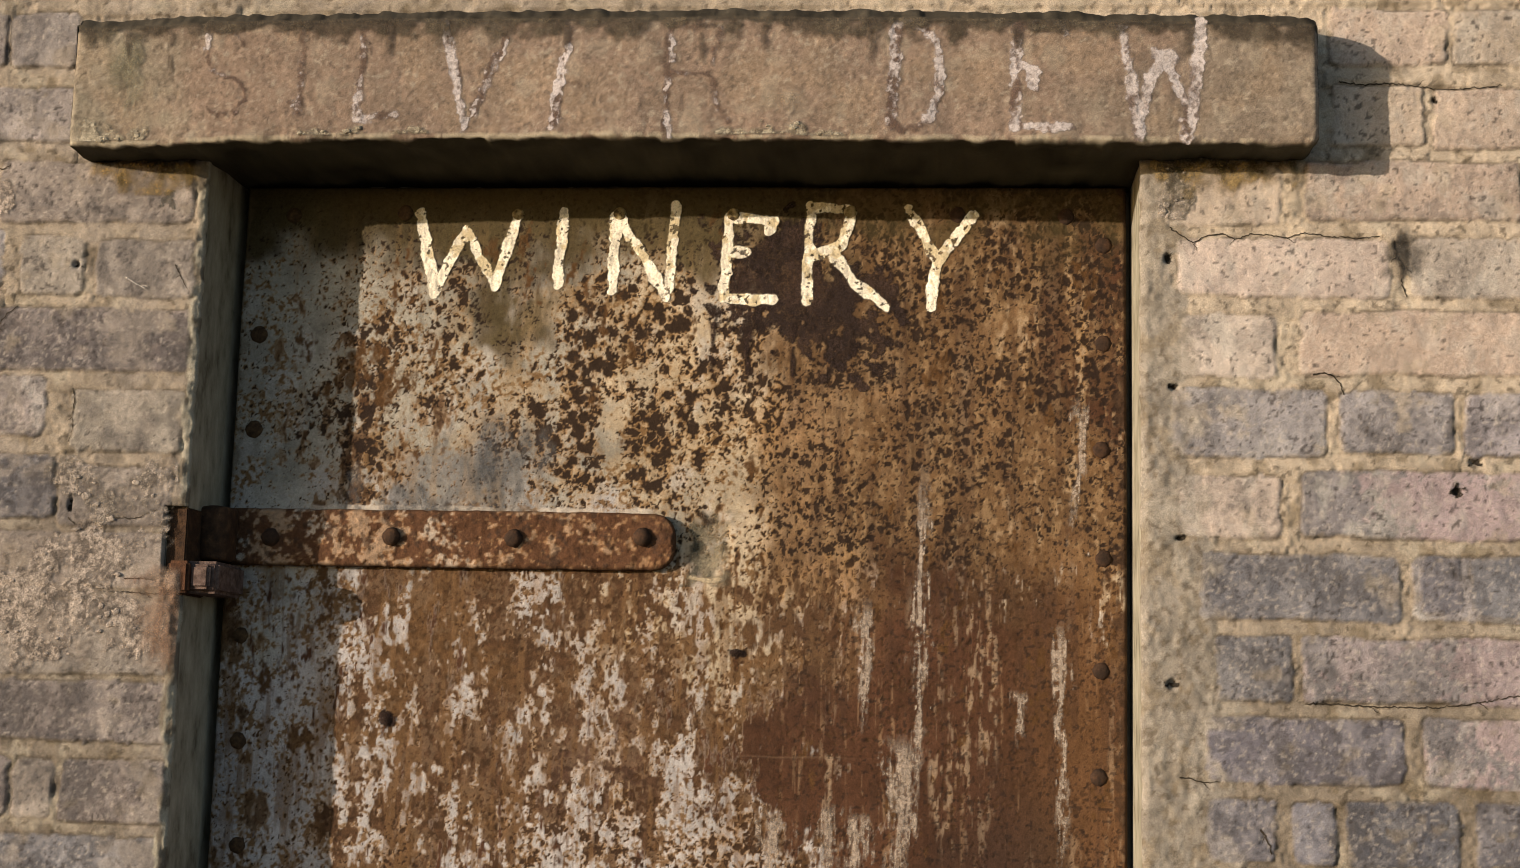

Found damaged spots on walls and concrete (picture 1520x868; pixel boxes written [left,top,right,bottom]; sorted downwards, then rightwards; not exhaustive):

rust [689,201,911,392]
crack [1170,227,1407,297]